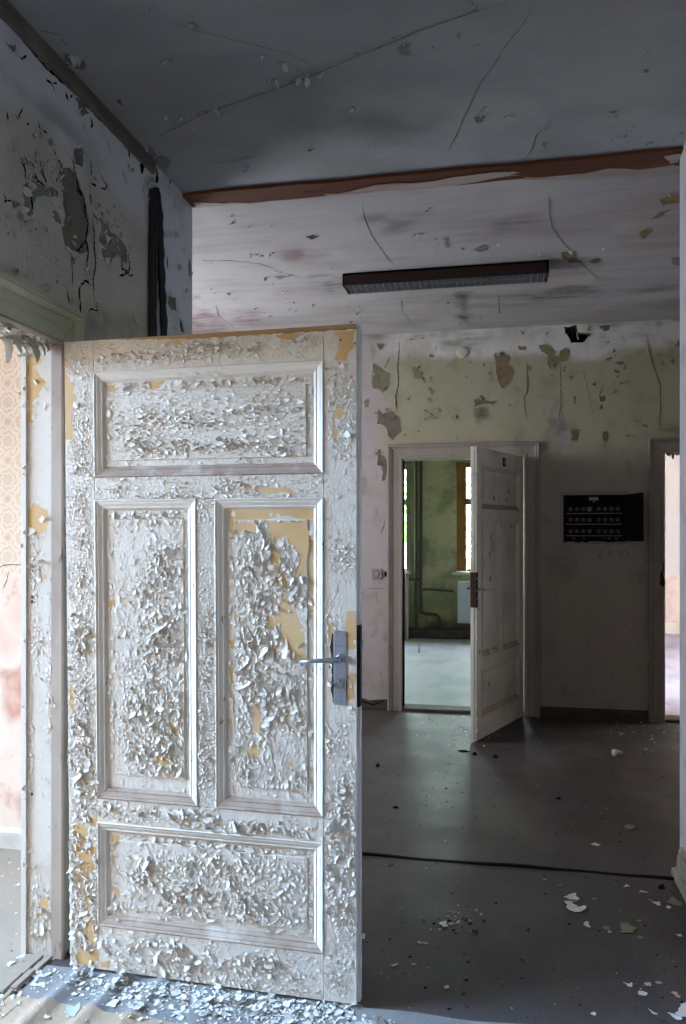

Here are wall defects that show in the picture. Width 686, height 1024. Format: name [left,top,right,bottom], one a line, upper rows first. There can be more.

crack [142,3,502,139]
crack [444,2,536,157]
crack [0,108,134,315]
peeling [10,145,131,272]
peeling [435,236,500,252]
peeling [560,247,611,266]
crack [549,197,639,279]
peeling [637,193,680,240]
crack [385,301,411,412]
peeling [469,323,628,410]
crack [645,328,662,432]
peeling [0,256,459,1024]